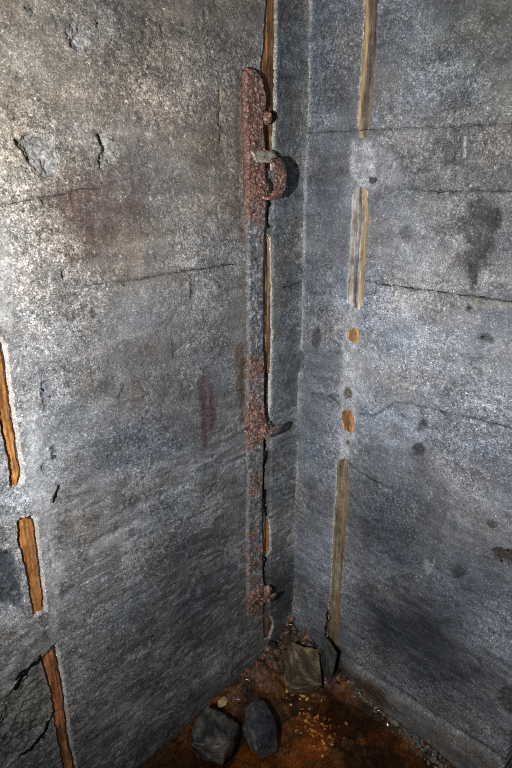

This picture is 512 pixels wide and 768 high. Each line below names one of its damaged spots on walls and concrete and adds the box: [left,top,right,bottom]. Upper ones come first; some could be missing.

spalling [13,132,60,181]
spalling [95,130,118,169]
leakage [463,199,512,309]
crack [89,264,234,296]
crack [365,280,512,304]
crack [261,439,269,517]
crack [13,655,42,690]
crack [20,715,53,756]